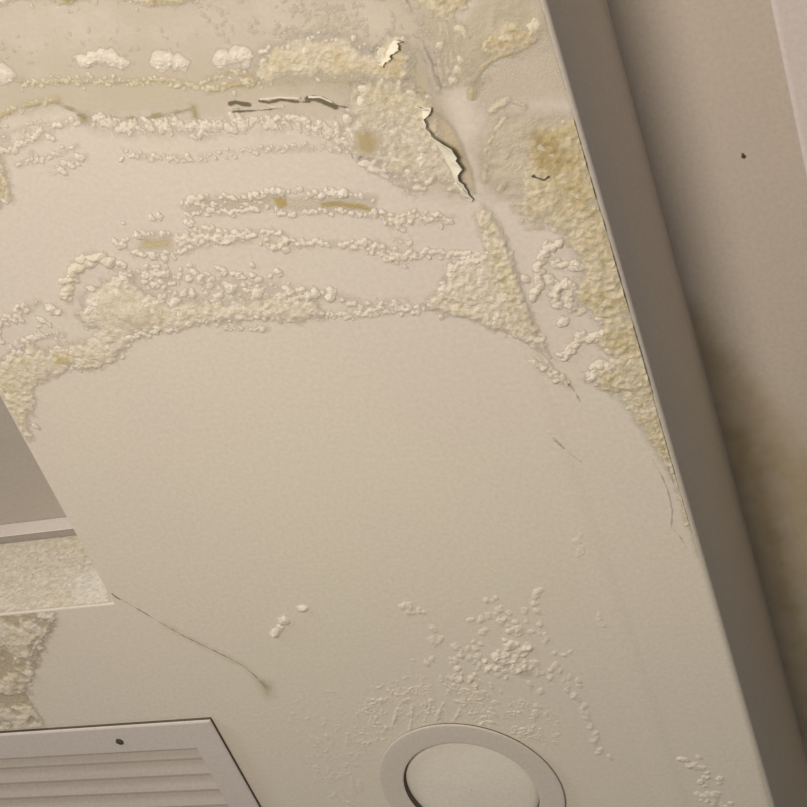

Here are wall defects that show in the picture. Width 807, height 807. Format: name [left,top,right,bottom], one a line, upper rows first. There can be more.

crack [228,95,348,113]
spalling [341,34,475,202]
damp [0,0,653,441]
spalling [0,612,57,730]